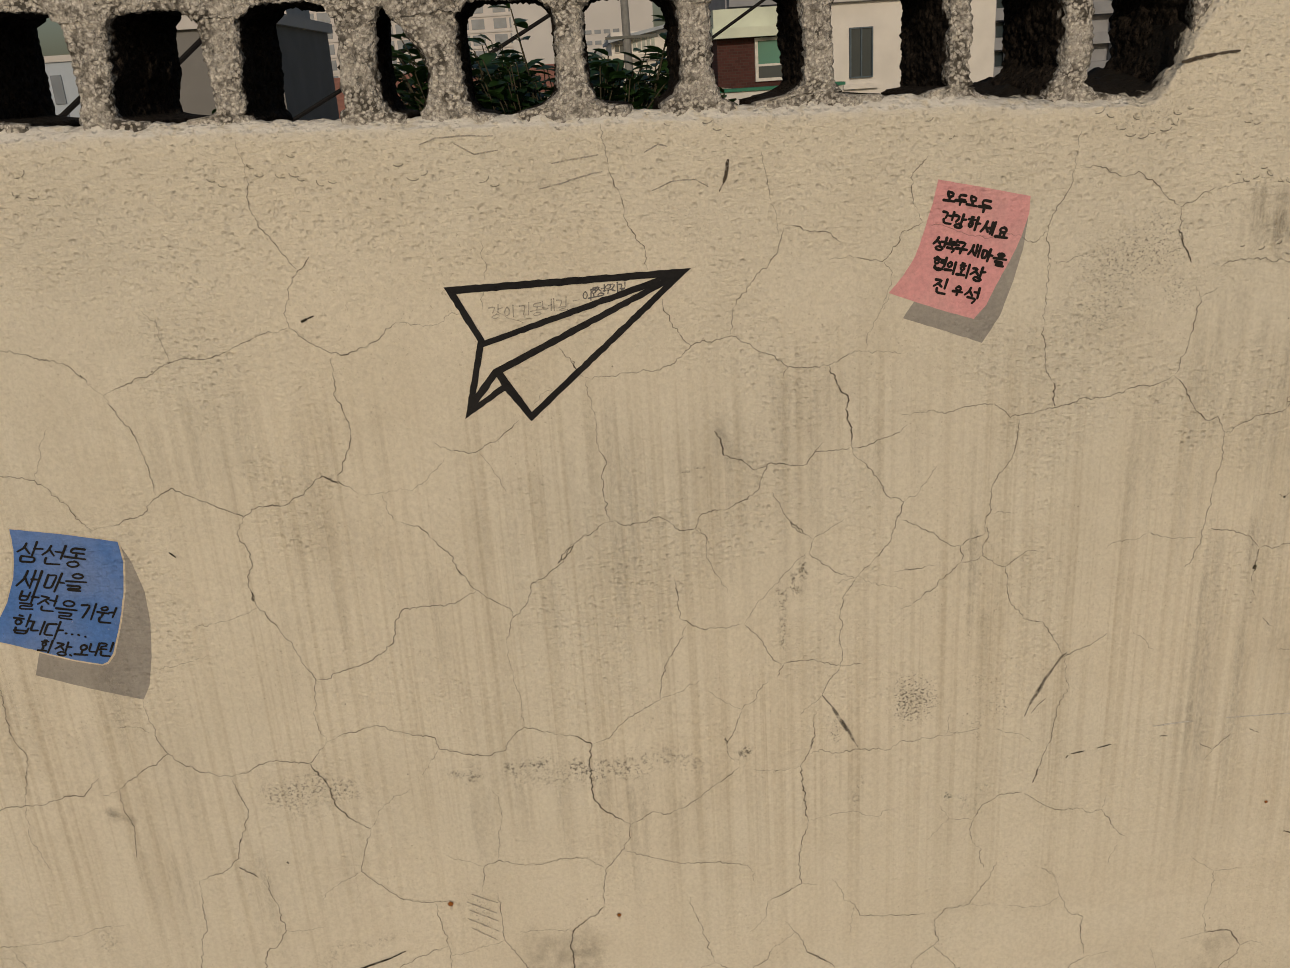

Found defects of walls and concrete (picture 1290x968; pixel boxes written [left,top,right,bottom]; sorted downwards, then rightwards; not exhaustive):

crack [1101,167,1213,262]
crack [109,187,392,626]
crack [547,226,1290,694]
crack [309,526,511,690]
crack [120,755,204,856]
crack [213,588,741,968]
crack [766,732,878,909]
crack [858,701,1122,968]